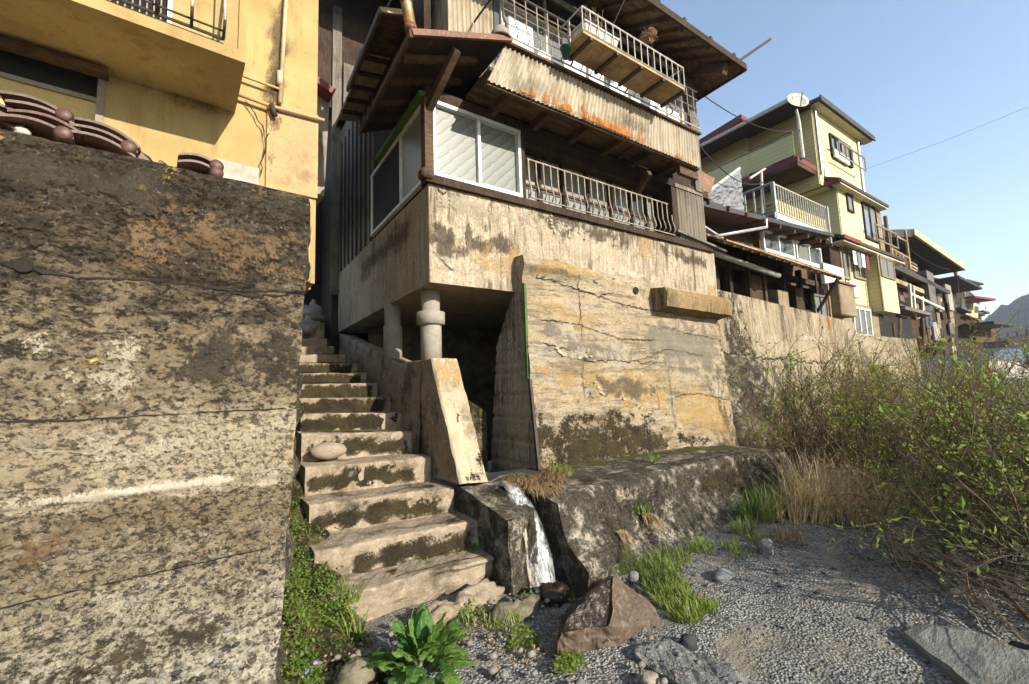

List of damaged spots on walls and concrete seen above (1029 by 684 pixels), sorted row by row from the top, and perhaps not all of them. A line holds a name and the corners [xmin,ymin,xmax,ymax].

rust [518,78,646,142]
water stain [429,193,707,283]
water stain [534,299,731,437]
crack [0,408,286,422]
crack [0,548,265,609]